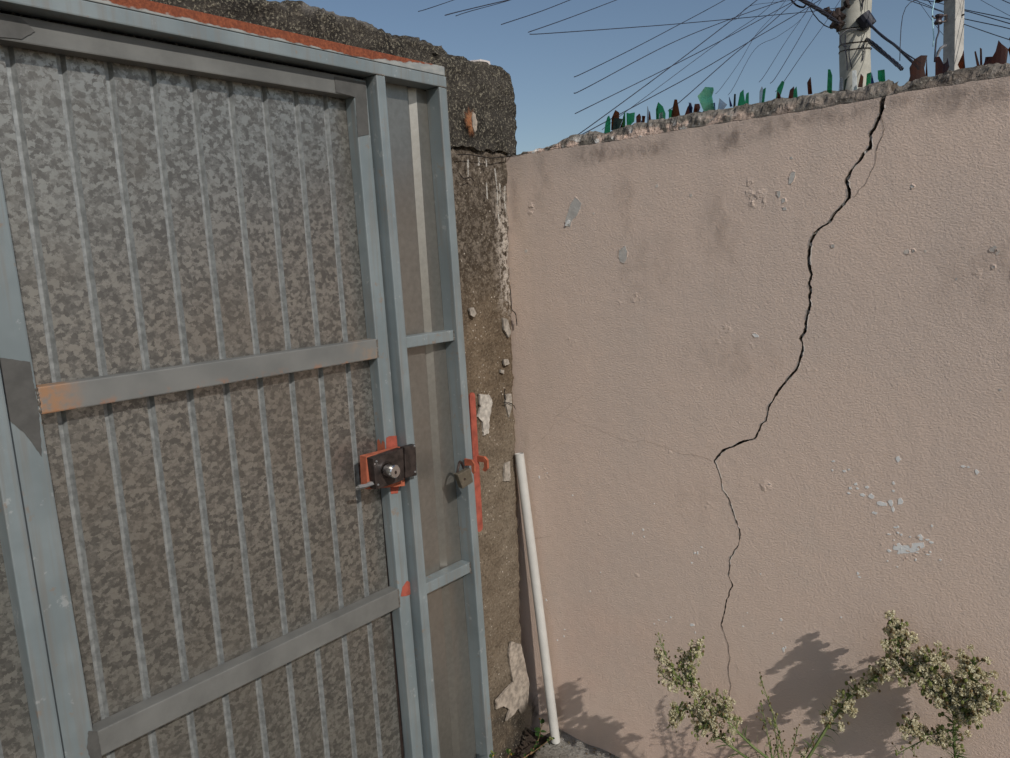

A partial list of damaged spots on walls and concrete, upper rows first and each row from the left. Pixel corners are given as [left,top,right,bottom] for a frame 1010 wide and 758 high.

crack [566,82,898,756]
spalling [847,481,903,515]
spalling [881,526,942,568]
flaking render [495,641,530,721]